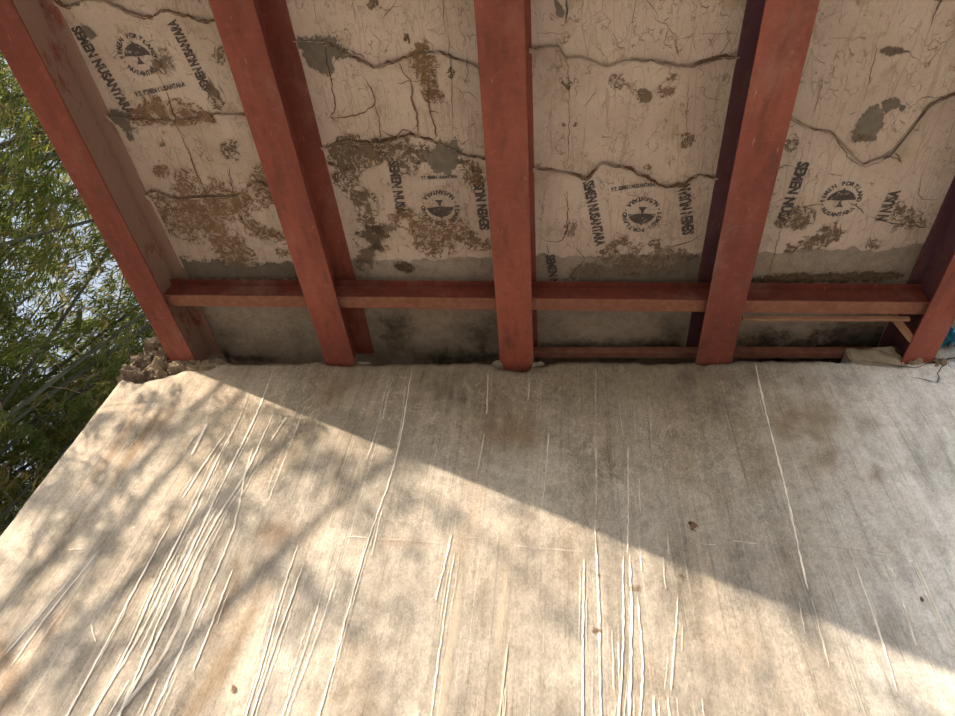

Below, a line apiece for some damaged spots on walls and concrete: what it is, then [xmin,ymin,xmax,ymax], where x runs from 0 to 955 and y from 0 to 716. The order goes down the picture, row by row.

peeling [296,34,351,77]
crack [325,1,477,140]
peeling [108,78,225,141]
crack [567,77,595,162]
crack [812,77,901,167]
peeling [850,98,905,142]
peeling [149,165,298,280]
peeling [326,135,492,258]
peeling [774,206,845,253]
crack [850,203,927,228]
peeling [394,261,417,273]
water stain [431,351,494,364]